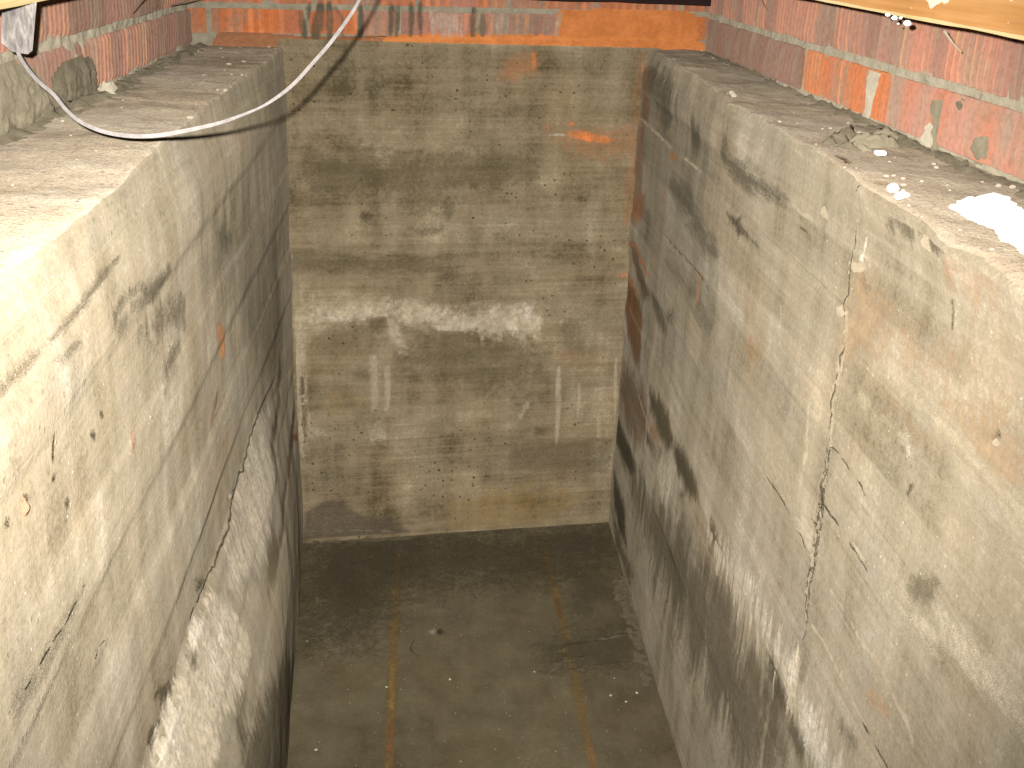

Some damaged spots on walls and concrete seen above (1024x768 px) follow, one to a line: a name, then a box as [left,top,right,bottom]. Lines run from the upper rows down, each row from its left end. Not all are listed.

corrosion [538,53,656,226]
crack [189,378,275,621]
leakage [111,61,859,768]
crack [767,185,868,640]